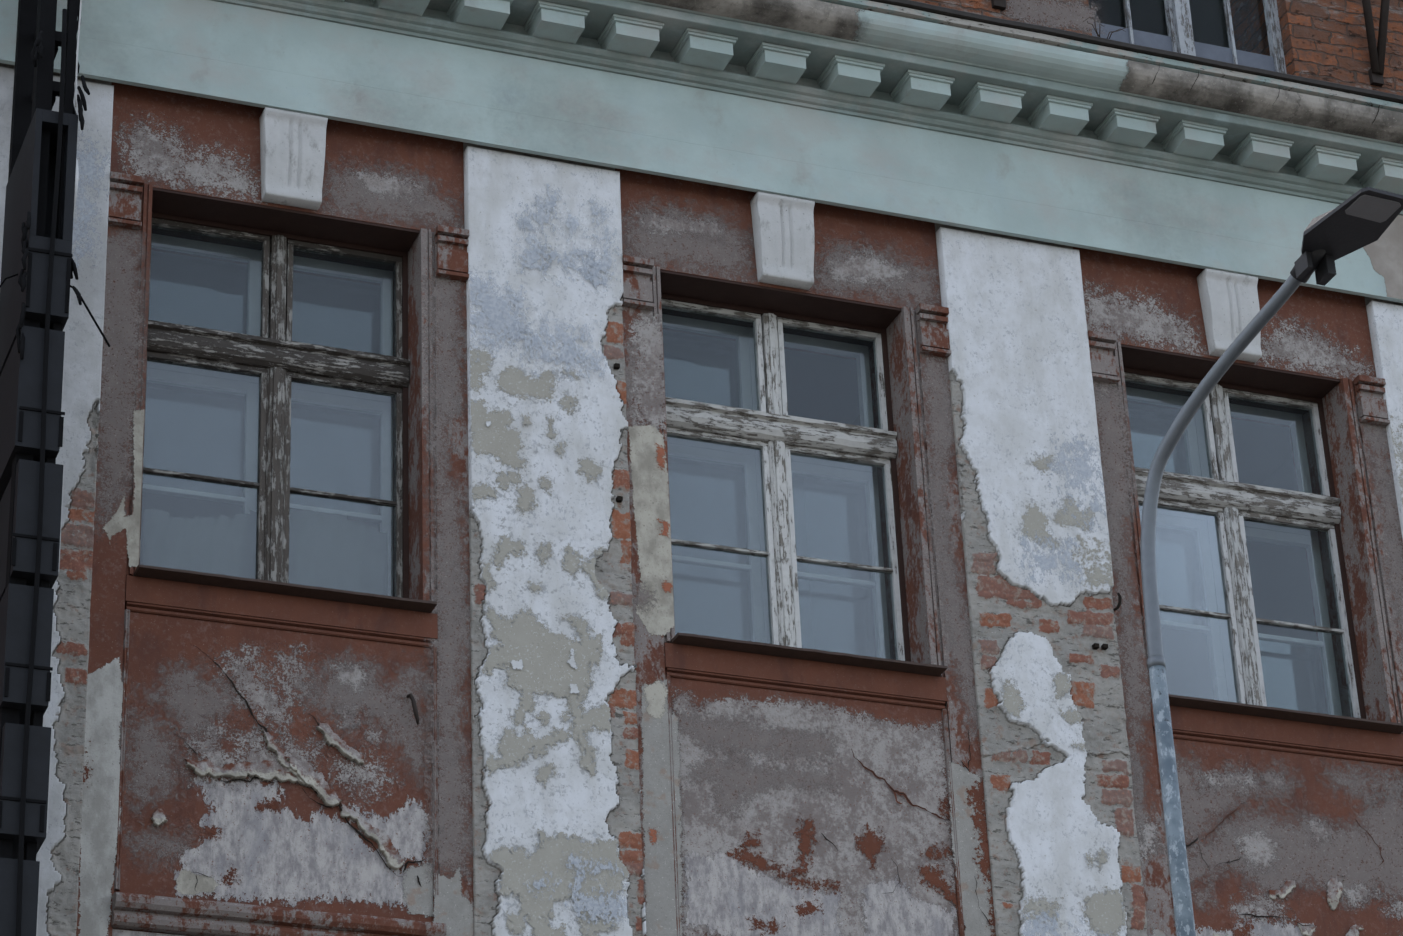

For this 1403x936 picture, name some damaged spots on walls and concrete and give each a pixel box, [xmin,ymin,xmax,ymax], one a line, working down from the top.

damp [639,0,862,42]
damp [1120,60,1403,144]
peeling [1363,215,1403,299]
peeling [1082,276,1208,357]
peeling [1250,314,1375,381]
peeling [45,108,1167,936]
peeling [1362,415,1403,662]
crack [193,645,268,732]
crack [175,734,428,886]
crack [851,749,949,820]
peeling [1175,749,1403,936]